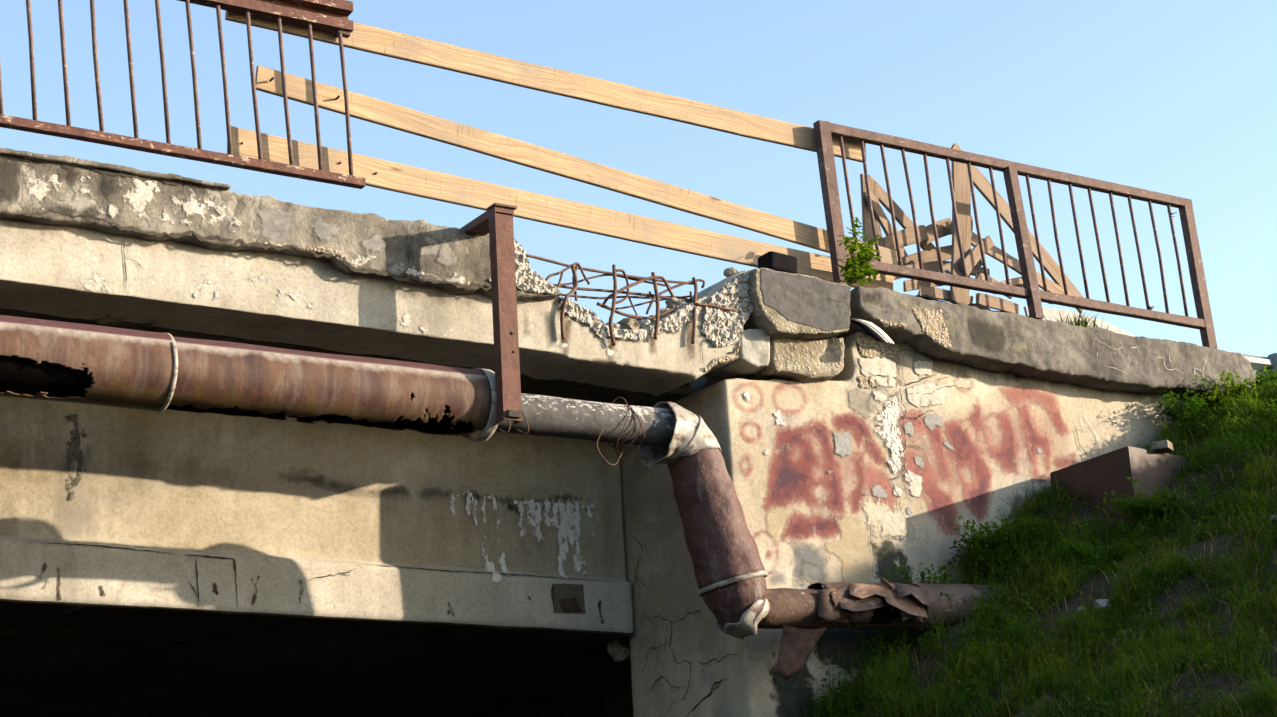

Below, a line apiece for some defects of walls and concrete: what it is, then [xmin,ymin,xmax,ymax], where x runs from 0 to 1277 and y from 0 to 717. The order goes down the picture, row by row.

flaking render [23,169,92,210]
flaking render [98,176,242,232]
flaking render [254,208,294,252]
flaking render [307,219,385,268]
flaking render [393,243,470,288]
spalling [514,240,754,372]
flaking render [825,308,954,583]
damp [299,478,356,493]
damp [422,490,596,583]
flaking render [767,508,789,536]
crack [309,532,736,717]